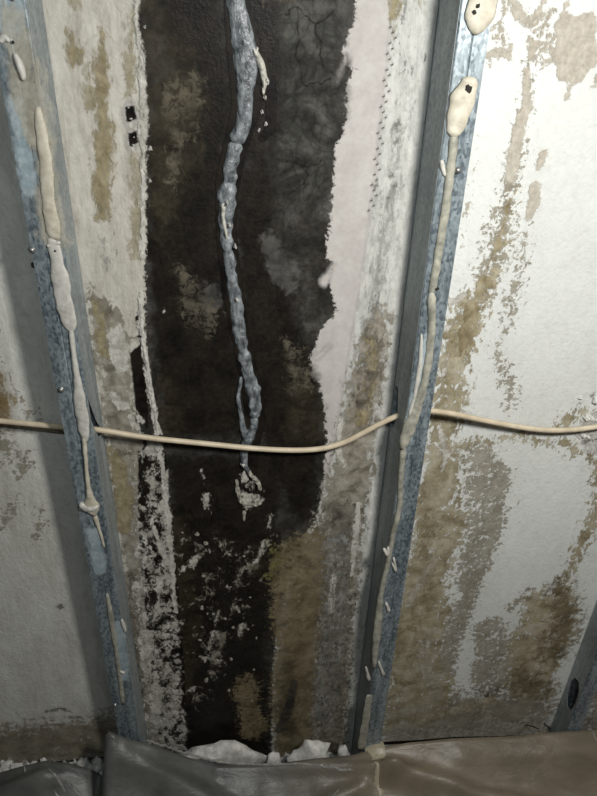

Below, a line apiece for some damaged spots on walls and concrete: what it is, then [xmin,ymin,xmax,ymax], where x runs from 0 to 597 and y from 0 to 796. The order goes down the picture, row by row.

damp [64,28,116,222]
damp [0,373,42,431]
damp [85,0,397,758]
damp [382,0,597,747]
damp [0,429,38,480]
damp [0,493,51,545]
damp [0,708,118,763]